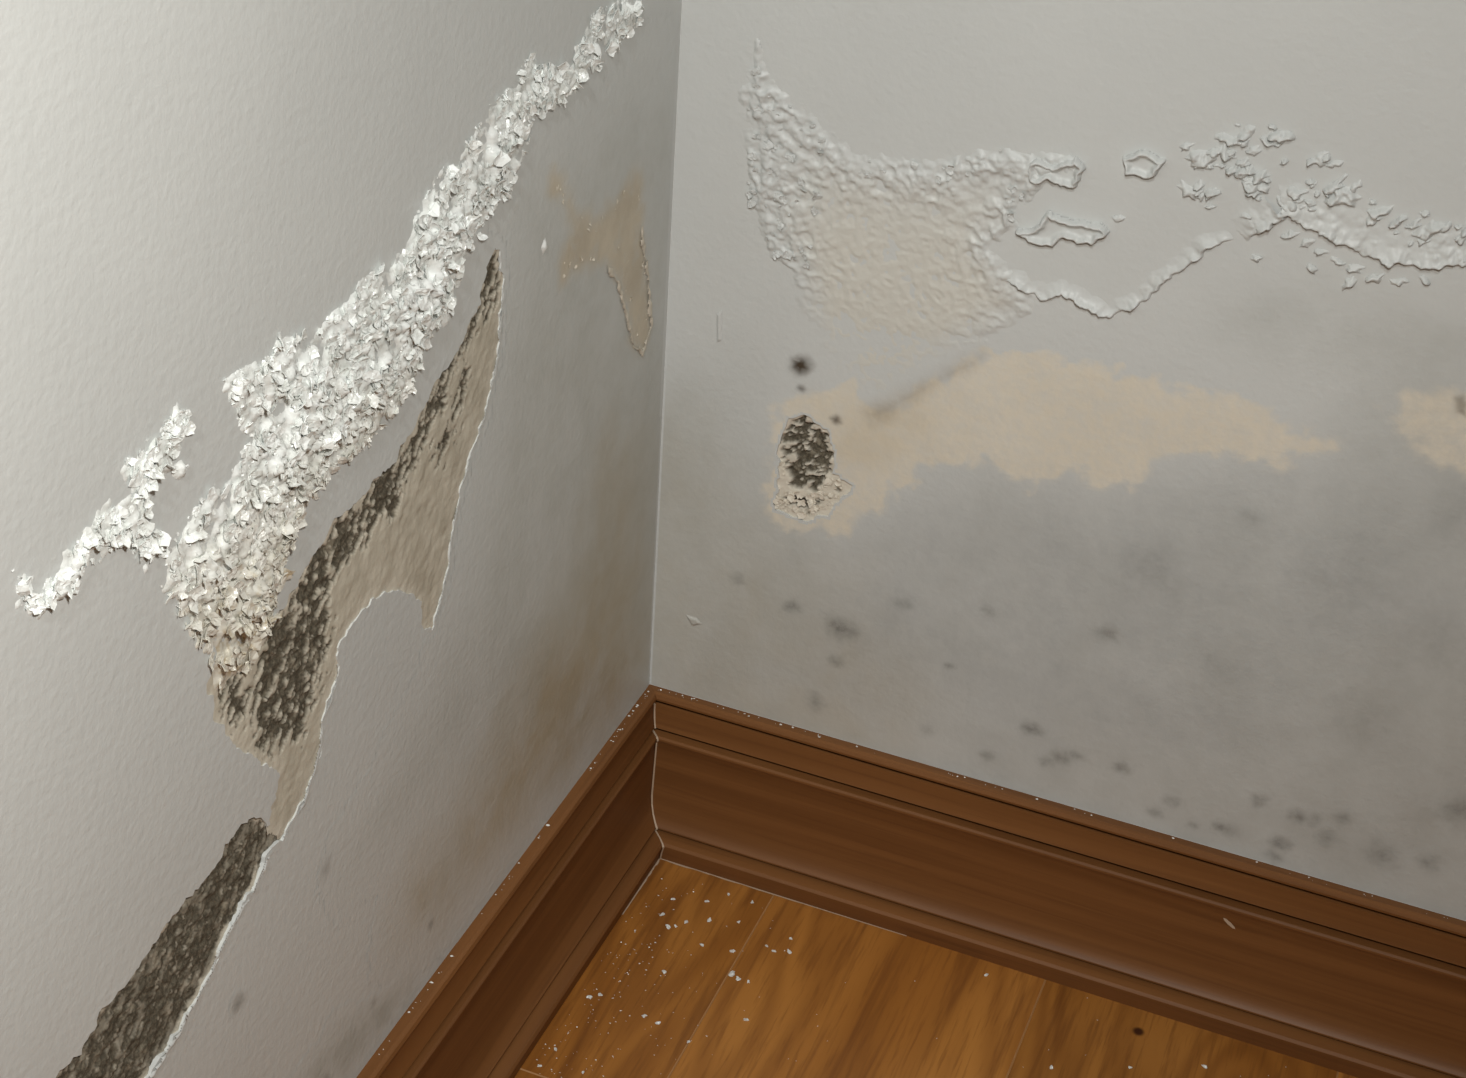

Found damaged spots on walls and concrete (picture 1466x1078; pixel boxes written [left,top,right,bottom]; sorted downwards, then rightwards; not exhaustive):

peeling [12,0,653,1078]
flaking render [773,415,852,521]
water stain [288,12,1466,1078]